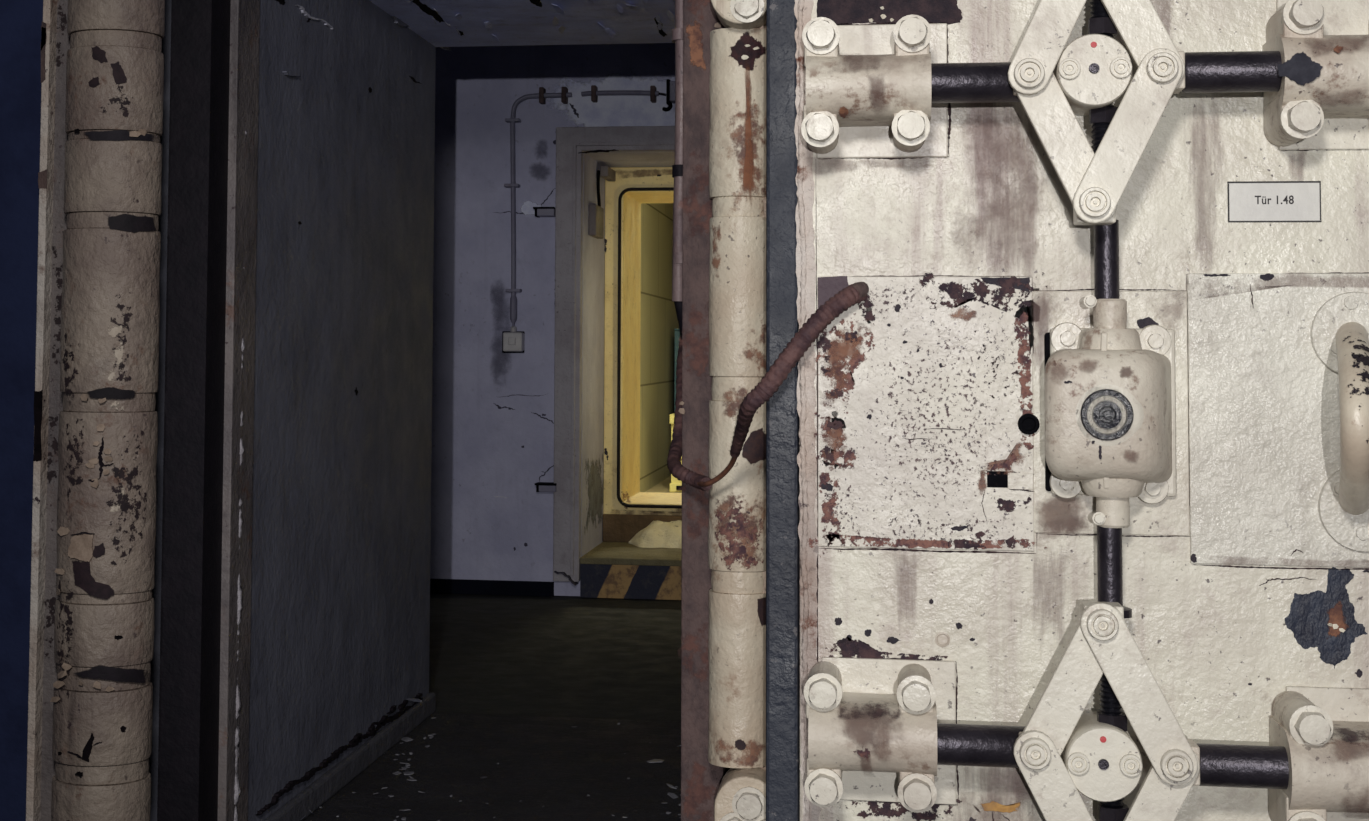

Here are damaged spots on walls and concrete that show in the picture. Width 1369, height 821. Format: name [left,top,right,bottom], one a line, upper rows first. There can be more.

peeling [409,0,464,36]
rust [817,0,963,25]
peeling [88,46,147,137]
flaking render [548,74,675,127]
rust [731,71,766,195]
rust [813,314,875,469]
peeling [44,430,147,703]
rust [680,461,764,570]
rust [978,443,1023,491]
peeling [1285,567,1369,678]